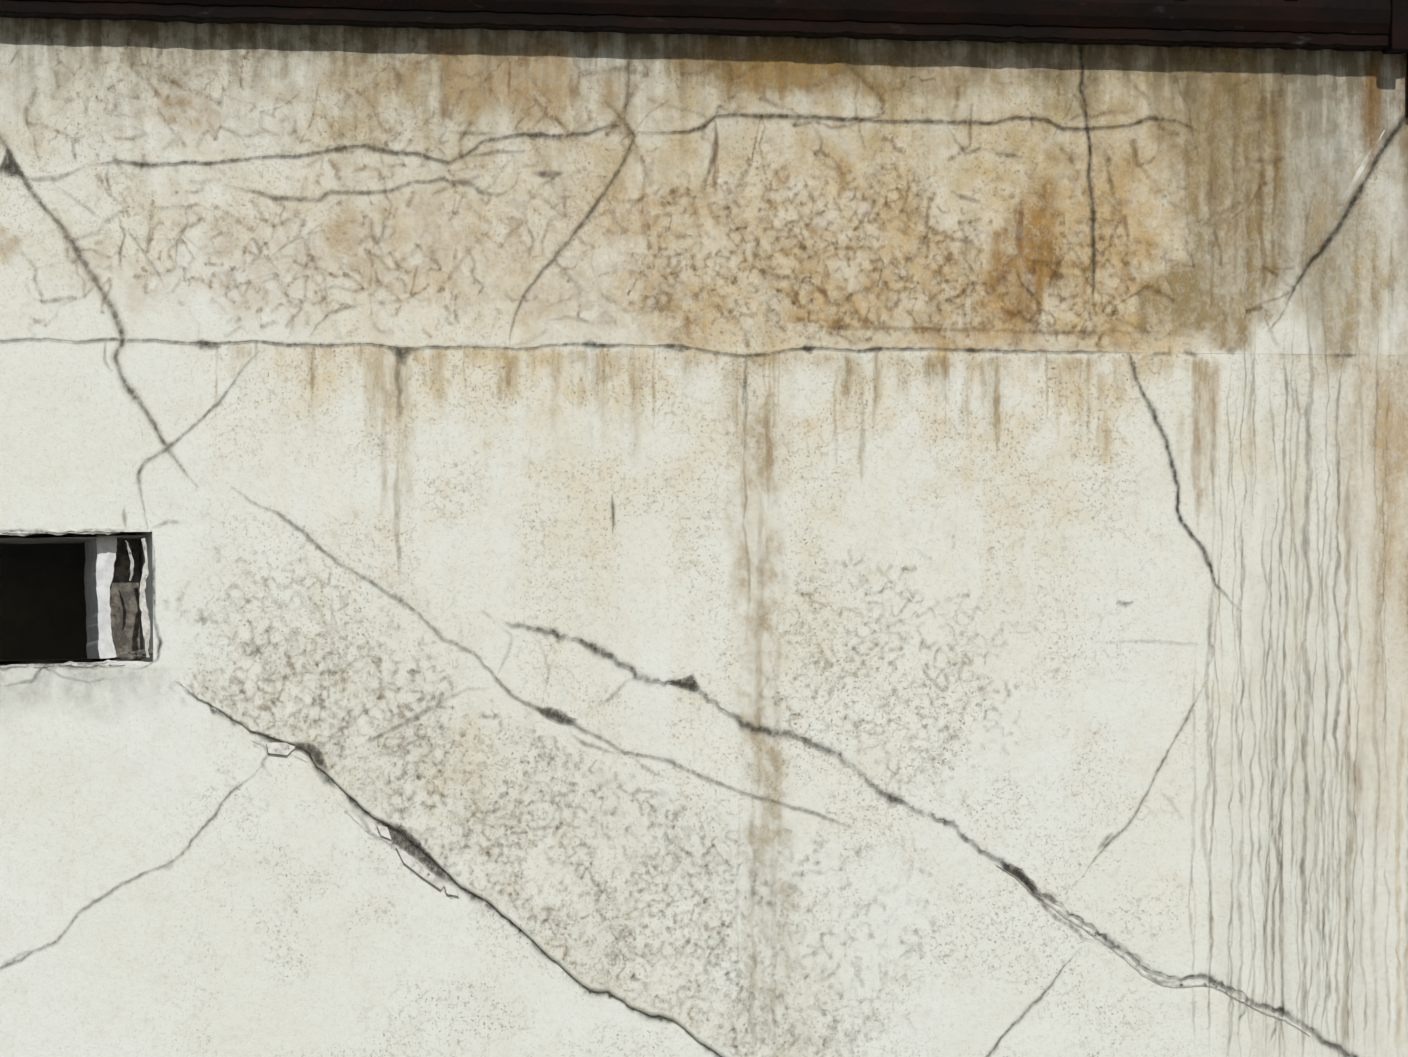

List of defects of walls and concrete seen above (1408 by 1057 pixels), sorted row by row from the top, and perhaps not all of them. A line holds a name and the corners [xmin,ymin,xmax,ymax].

rust [710,37,840,91]
crack [253,131,592,200]
crack [674,46,1163,387]
rust [745,47,1284,345]
crack [1269,113,1408,288]
rust [1303,198,1389,363]
crack [1134,367,1215,581]
crack [537,628,691,686]
spalling [266,742,328,769]
crack [251,735,480,899]
spalling [377,823,459,896]
crack [872,784,1357,1057]